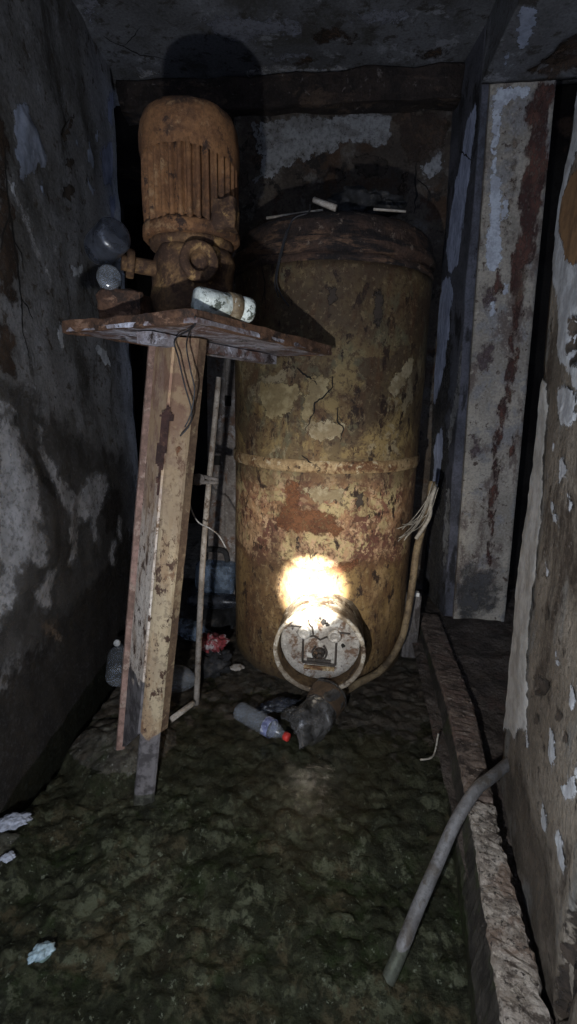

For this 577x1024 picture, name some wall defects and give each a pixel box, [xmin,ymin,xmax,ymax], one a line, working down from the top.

peeling [485,86,530,271]
peeling [489,283,509,317]
corrosion [486,82,555,566]
peeling [552,96,577,427]
peeling [552,443,567,483]
peeling [526,685,576,768]
peeling [560,767,577,801]
peeling [541,804,565,874]